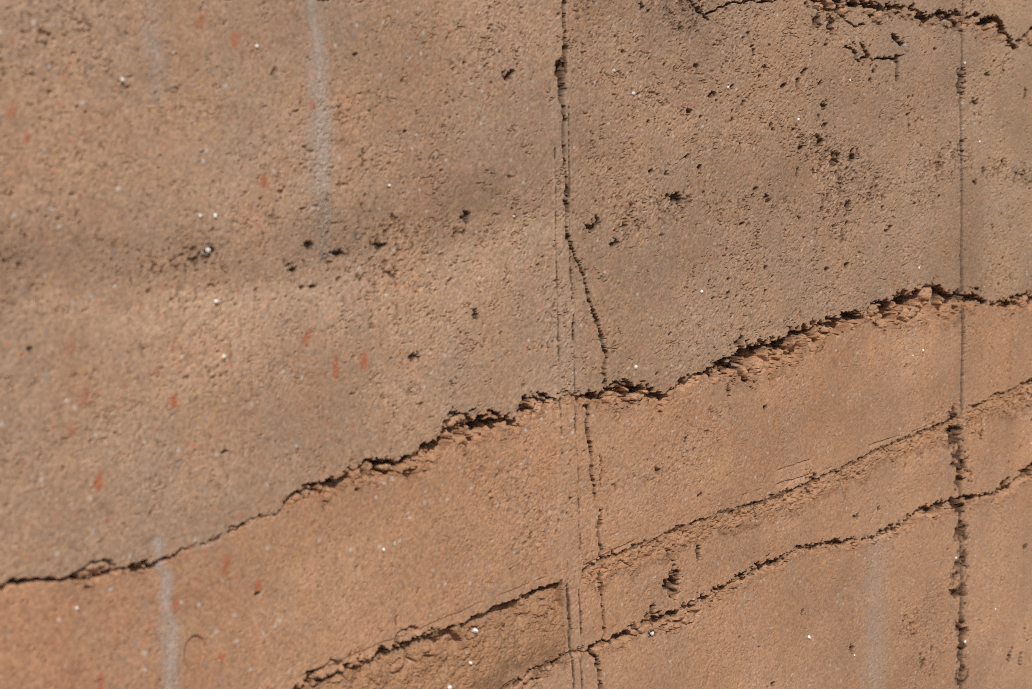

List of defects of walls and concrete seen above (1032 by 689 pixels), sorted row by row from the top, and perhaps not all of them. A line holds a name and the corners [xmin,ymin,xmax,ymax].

crack [554,45,565,98]
crack [694,0,768,20]
crack [837,13,899,80]
crack [693,286,1032,390]
crack [279,313,675,512]
crack [9,560,154,590]
crack [500,462,1032,689]
spalling [293,582,566,689]